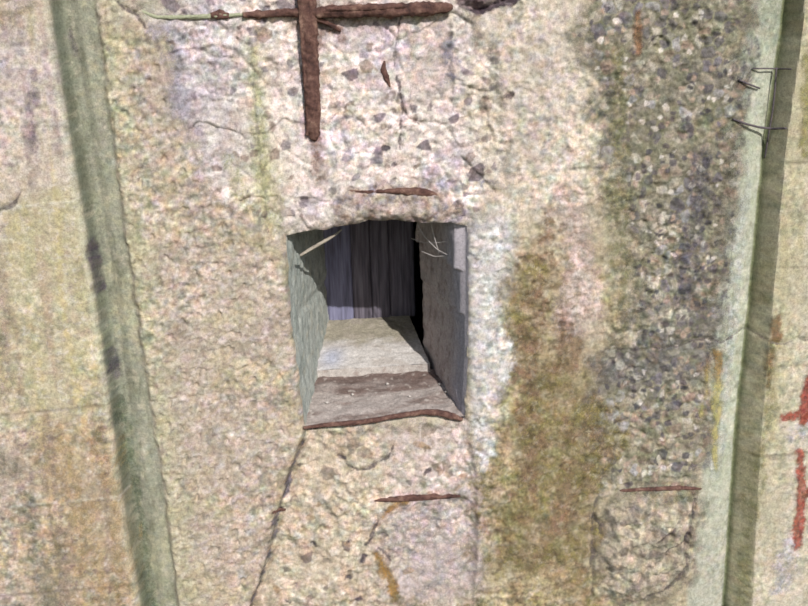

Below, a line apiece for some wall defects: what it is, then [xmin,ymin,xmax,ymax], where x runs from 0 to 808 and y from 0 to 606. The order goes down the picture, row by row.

rust [142,0,453,181]
crack [394,64,419,144]
rust [349,187,437,197]
damp [87,238,106,293]
damp [473,218,517,384]
damp [473,404,496,471]
crack [251,441,304,602]
rust [374,552,399,601]
rust [374,493,461,519]
crack [649,498,695,596]